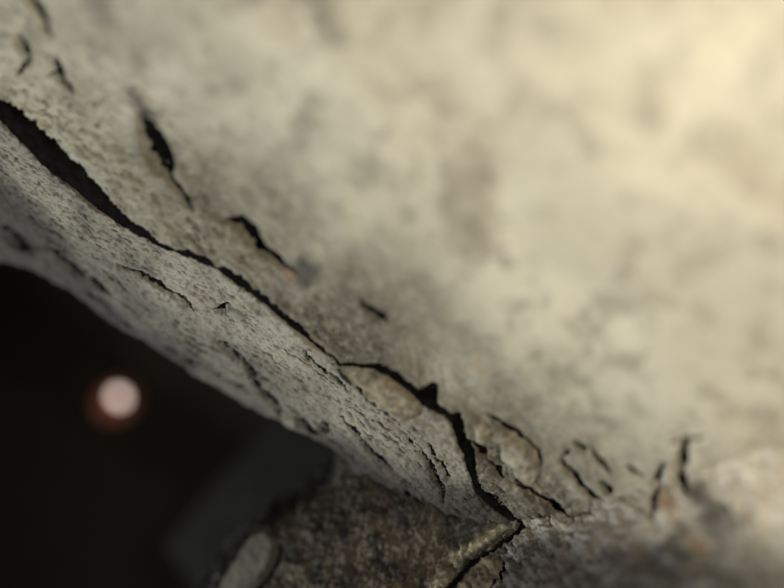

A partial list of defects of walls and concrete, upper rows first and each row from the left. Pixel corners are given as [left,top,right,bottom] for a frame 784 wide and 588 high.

crack [32,0,52,34]
crack [16,34,32,75]
crack [47,55,74,93]
crack [0,99,526,588]